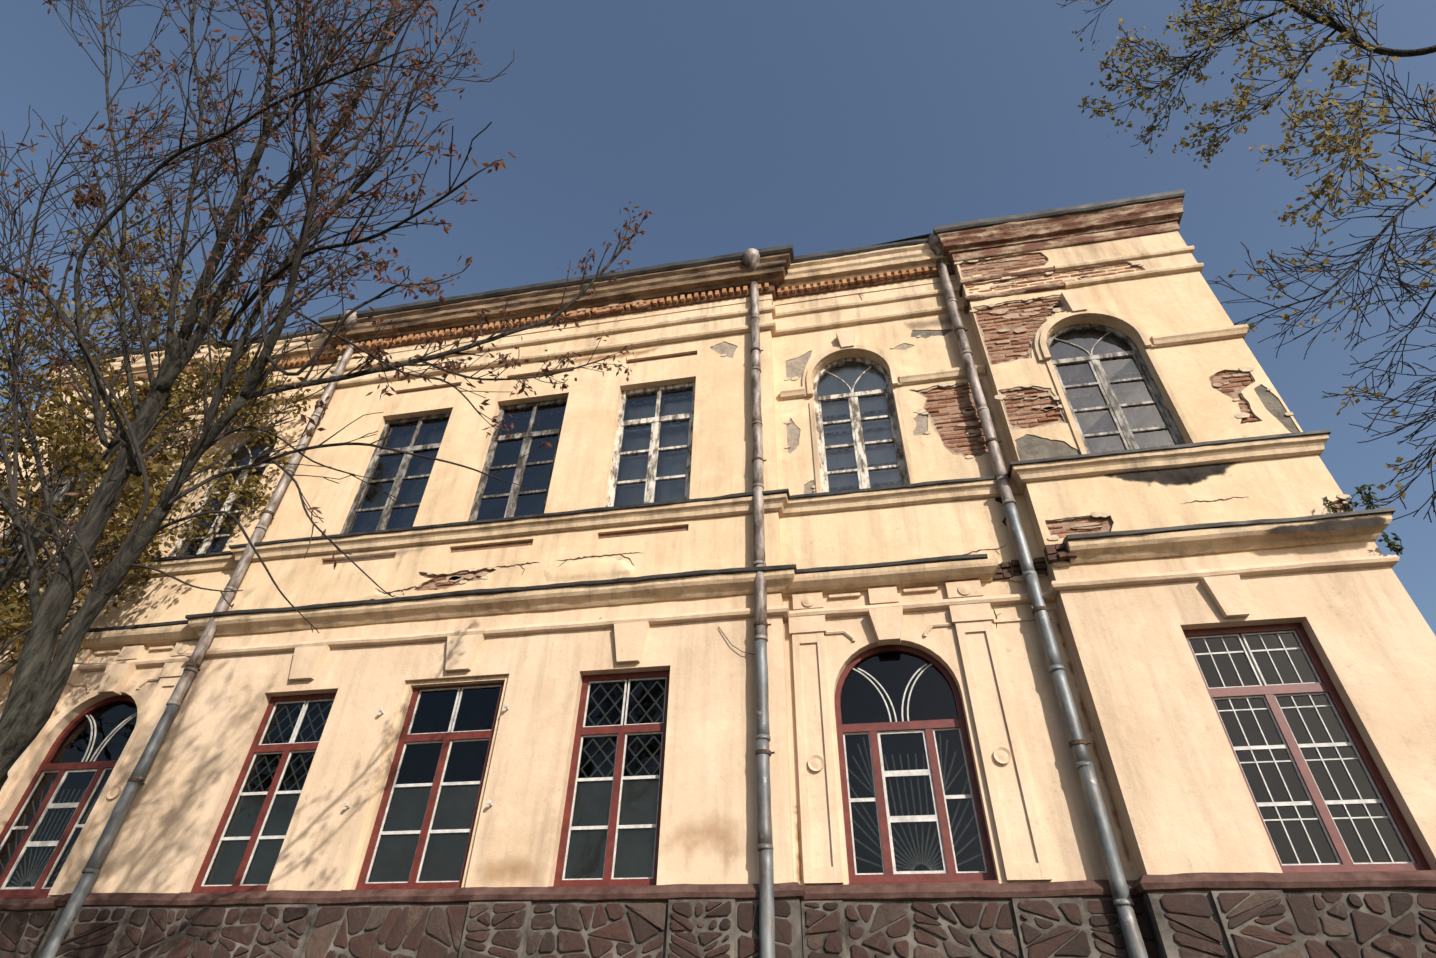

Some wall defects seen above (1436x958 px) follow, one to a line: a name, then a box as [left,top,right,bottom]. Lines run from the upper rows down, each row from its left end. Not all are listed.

flaking render [954,253,1144,365]
spalling [711,342,737,358]
spalling [890,327,954,350]
spalling [784,351,812,381]
flaking render [1209,367,1261,424]
flaking render [910,382,1067,459]
spalling [784,418,801,454]
flaking render [1045,512,1113,541]
crack [496,552,640,574]
flaking render [415,567,495,591]